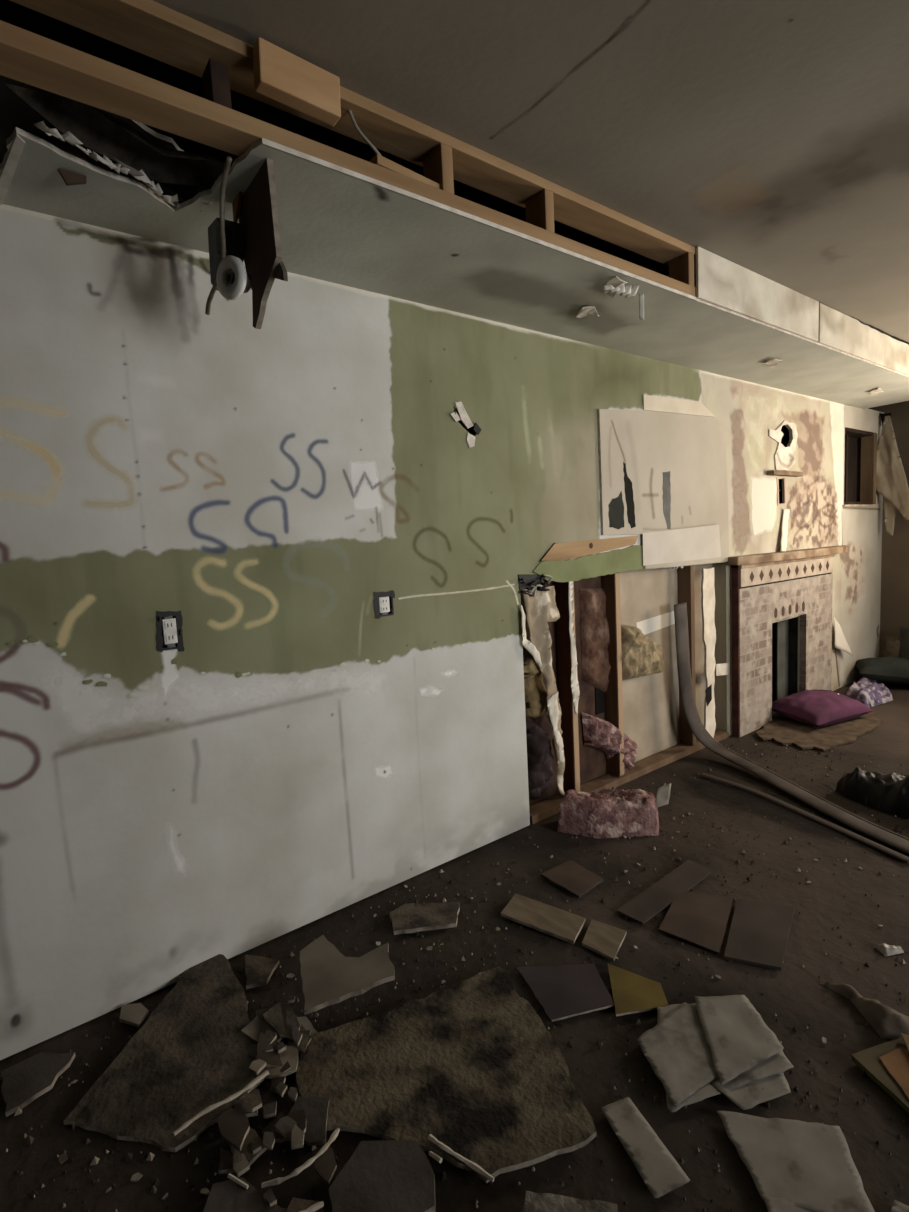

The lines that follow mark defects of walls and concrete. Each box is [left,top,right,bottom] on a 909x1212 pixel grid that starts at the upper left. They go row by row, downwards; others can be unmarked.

leakage [120,238,192,295]
peeling [732,410,749,552]
peeling [766,411,838,550]
peeling [840,546,862,601]
spalling [156,611,185,664]
peeling [83,674,111,687]
spalling [595,687,605,715]